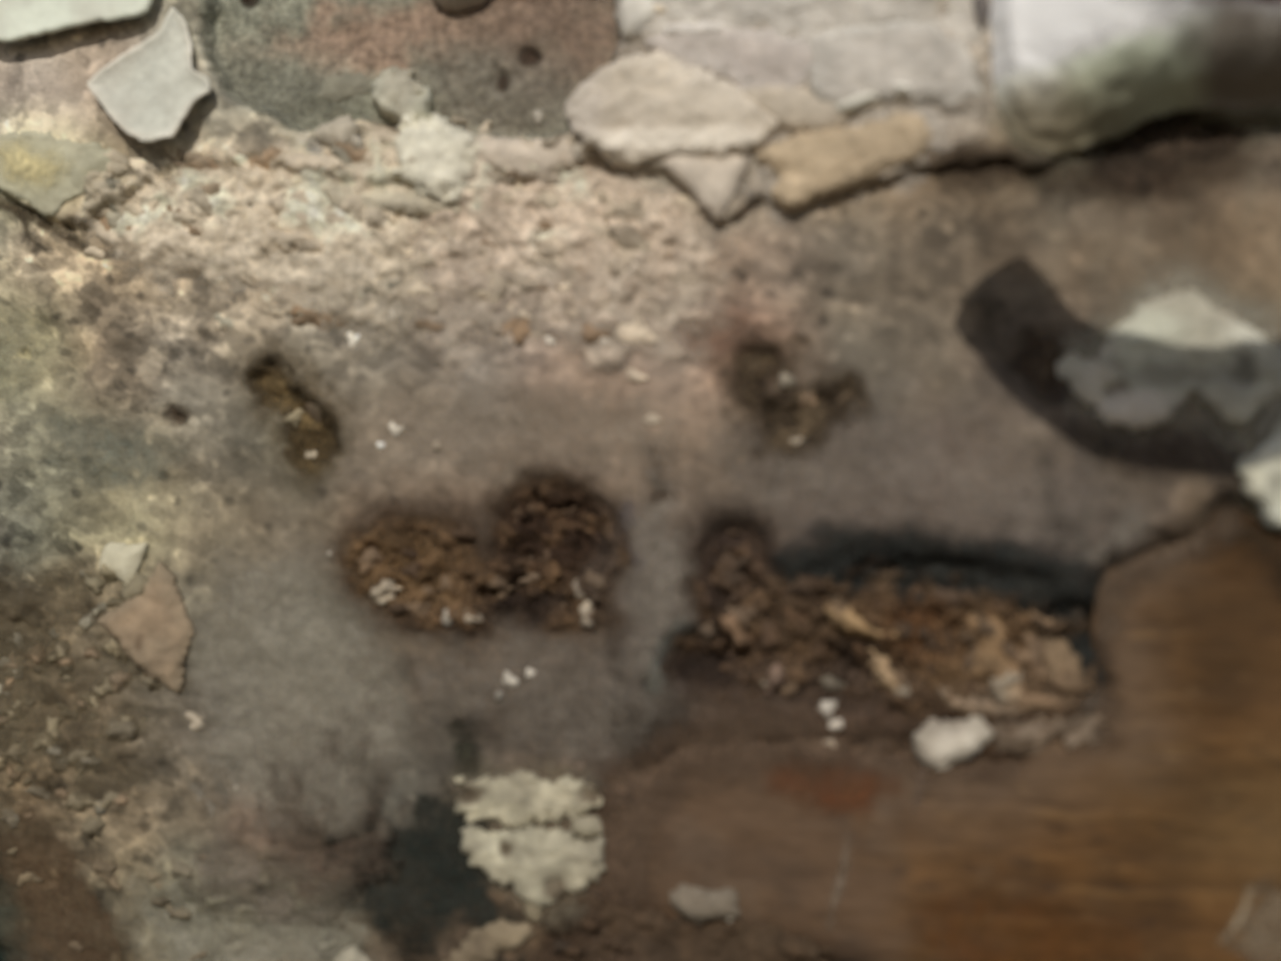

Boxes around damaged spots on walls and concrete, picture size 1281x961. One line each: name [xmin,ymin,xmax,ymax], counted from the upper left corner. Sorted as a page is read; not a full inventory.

peeling [0,0,994,383]
hole [249,353,343,475]
hole [713,344,867,456]
hole [338,464,633,649]
hole [659,519,1099,724]
damp [146,565,525,961]